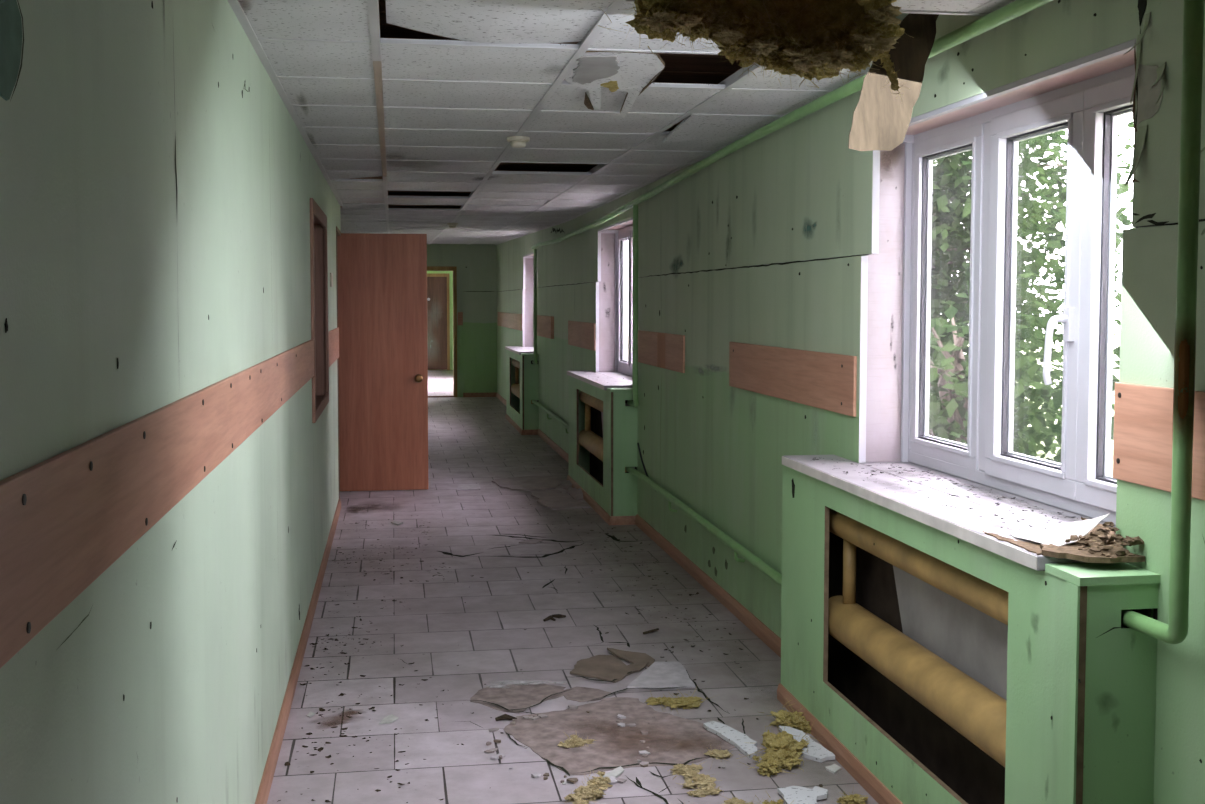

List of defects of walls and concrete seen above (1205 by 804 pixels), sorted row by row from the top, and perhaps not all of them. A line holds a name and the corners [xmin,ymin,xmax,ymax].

peeling [0,0,22,100]
peeling [1124,125,1148,186]
crack [438,534,635,591]
crack [457,625,745,804]
spalling [470,683,736,785]